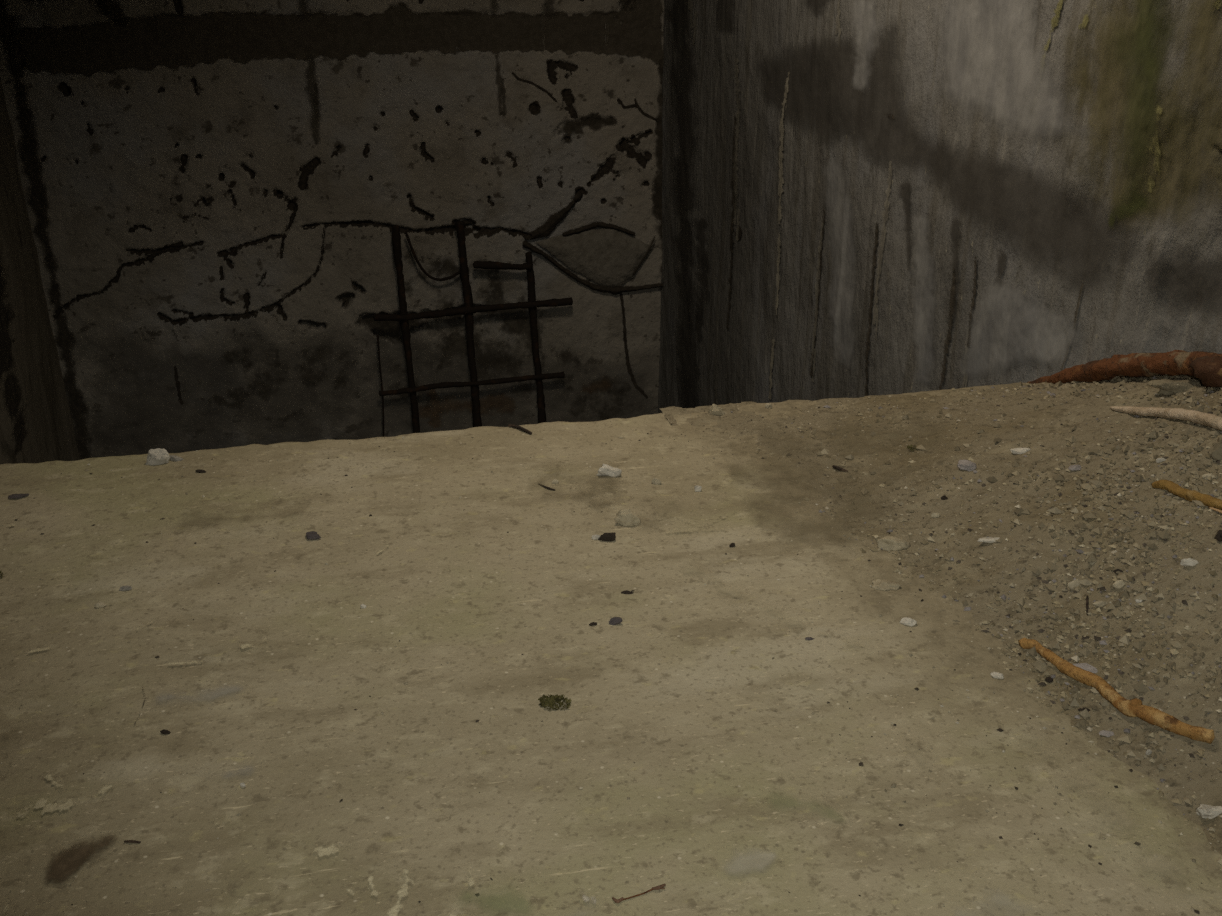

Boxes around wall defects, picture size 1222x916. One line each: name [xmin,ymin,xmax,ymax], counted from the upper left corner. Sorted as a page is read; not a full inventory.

crack [512,72,557,102]
crack [617,98,657,120]
crack [53,190,527,326]
spalling [339,282,365,307]
spalling [358,220,573,437]
leakage [47,836,113,883]